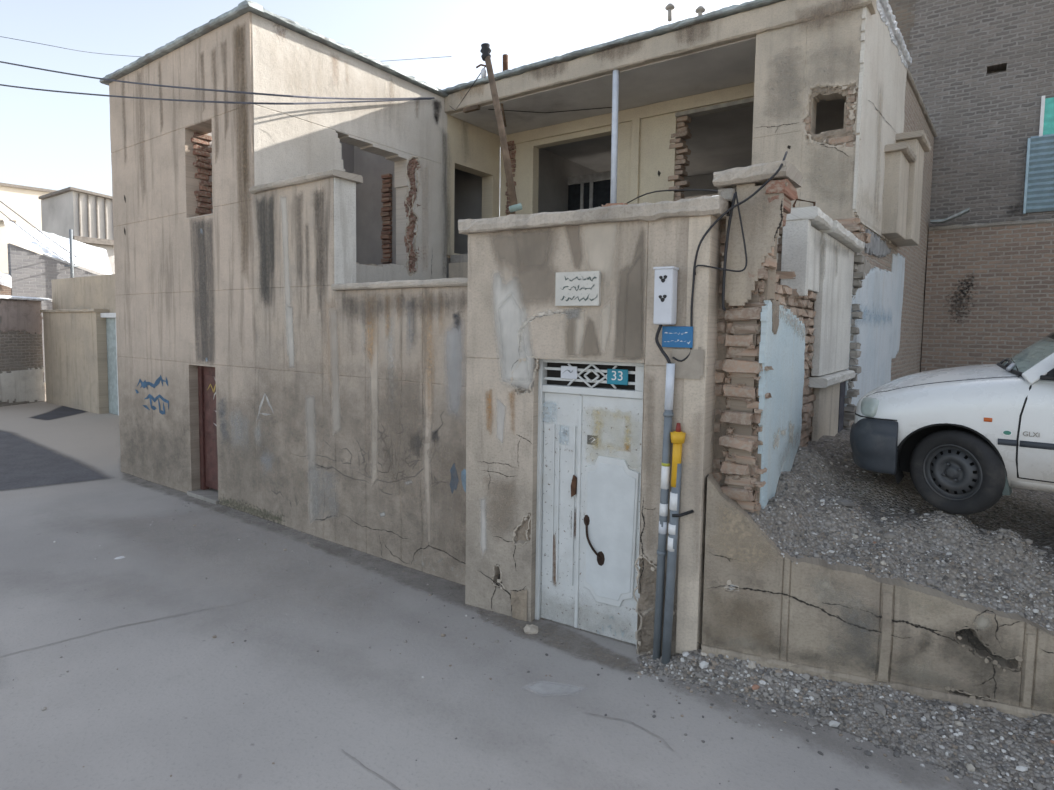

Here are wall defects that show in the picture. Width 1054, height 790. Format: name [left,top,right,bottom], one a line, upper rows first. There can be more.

spalling [798,79,861,151]
flaking render [191,132,213,216]
water stain [226,97,301,367]
flaking render [404,156,425,276]
water stain [193,221,214,361]
crack [480,434,532,490]
crack [314,515,526,611]
crack [707,552,1020,698]
hole [953,626,1023,672]